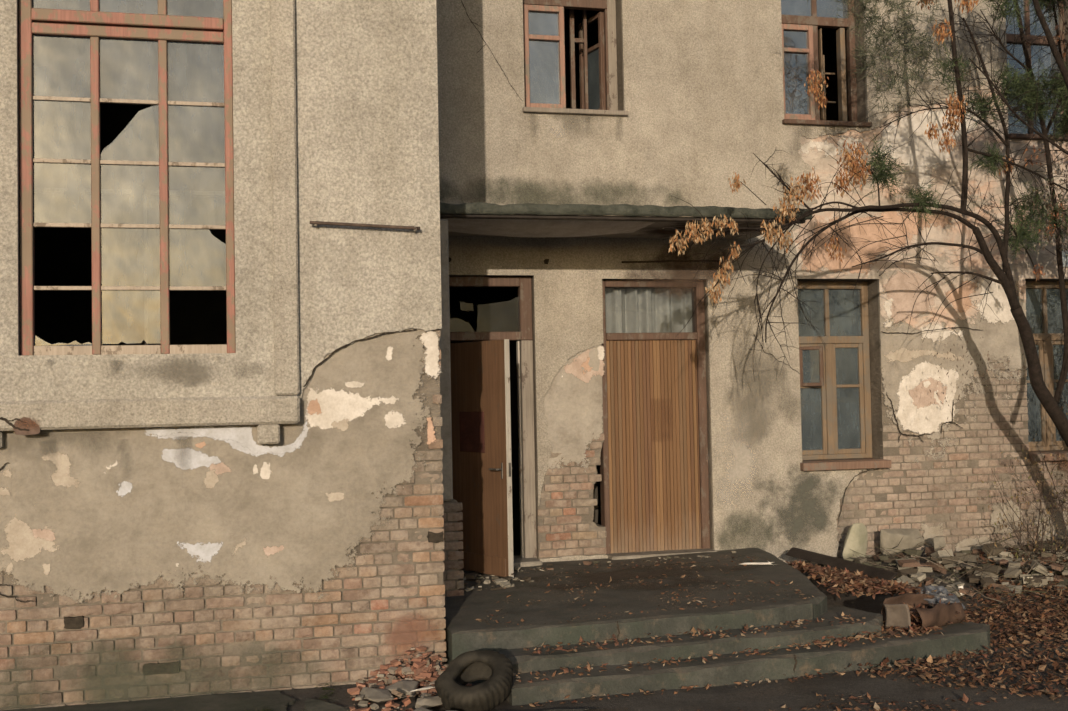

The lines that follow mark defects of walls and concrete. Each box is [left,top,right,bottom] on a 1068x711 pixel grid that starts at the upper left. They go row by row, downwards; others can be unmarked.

crack [461,1,521,99]
spalling [793,76,1068,559]
spalling [0,328,464,711]
spalling [536,344,607,558]
damp [778,472,835,543]